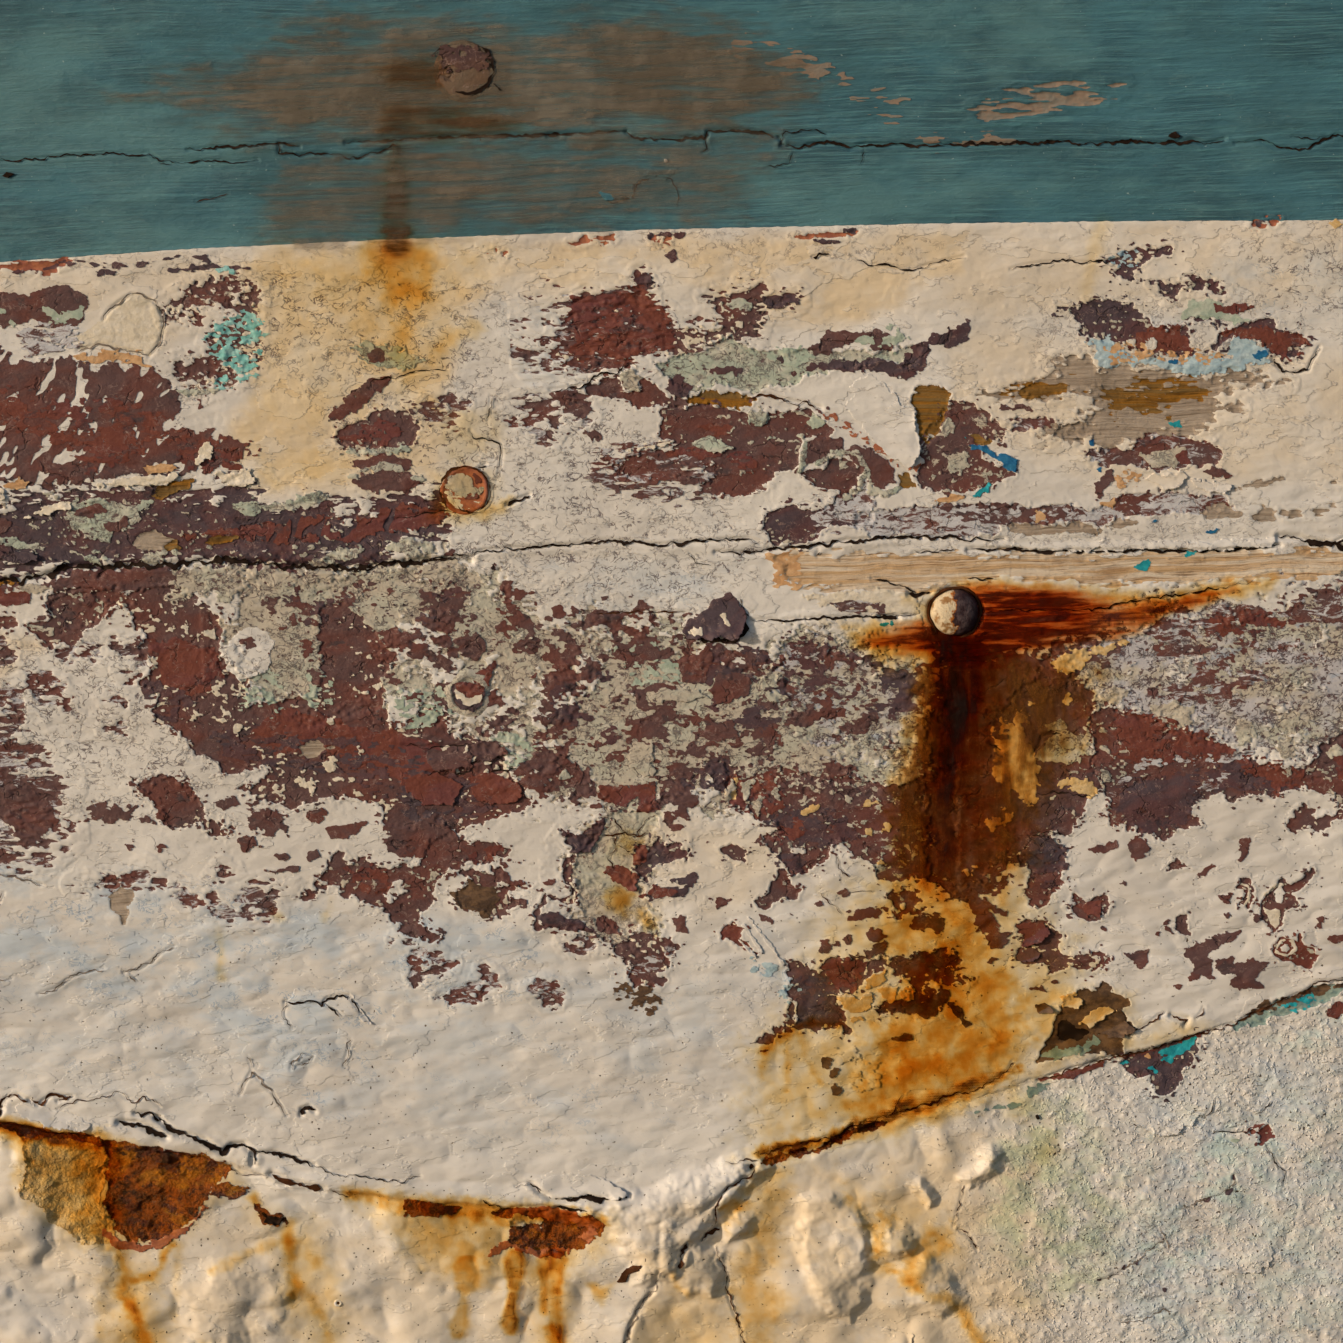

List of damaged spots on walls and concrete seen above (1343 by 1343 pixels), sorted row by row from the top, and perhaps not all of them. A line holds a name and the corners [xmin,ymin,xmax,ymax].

leakage [176,17,809,149]
peeling [915,80,1127,146]
leakage [271,154,644,227]
peeling [794,228,858,244]
crack [0,534,1343,611]
peeling [0,239,1343,1137]
corrosion [877,586,1202,872]
corrosion [8,1125,66,1144]
crack [0,1091,420,1197]
crack [483,1183,627,1212]
corrosion [761,1141,808,1157]
crack [623,979,1343,1343]